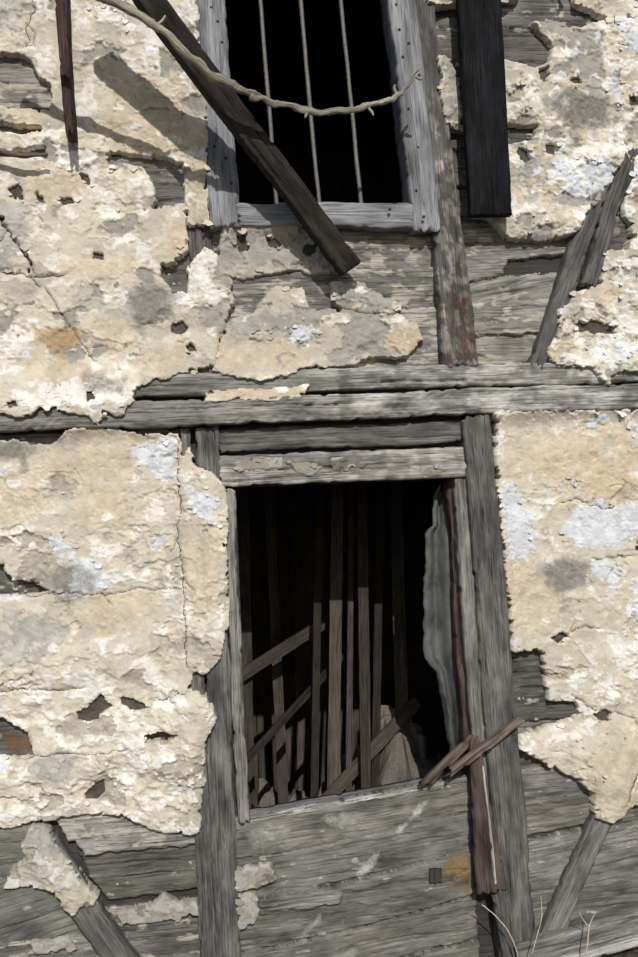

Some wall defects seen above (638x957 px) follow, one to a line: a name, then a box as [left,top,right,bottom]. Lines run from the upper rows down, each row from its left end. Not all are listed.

crack [0,220,99,362]
peeling [426,0,456,12]
peeling [436,55,463,135]
peeling [460,0,638,386]
crack [27,446,190,666]
peeling [0,0,434,930]
peeling [489,409,638,928]
peeling [31,934,76,955]